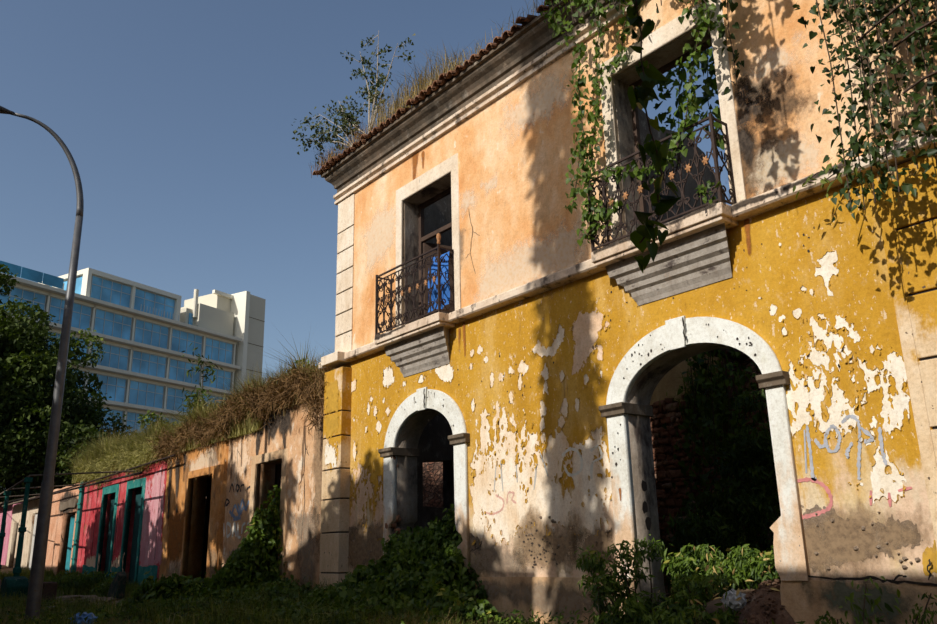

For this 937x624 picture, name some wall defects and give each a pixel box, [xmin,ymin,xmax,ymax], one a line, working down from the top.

water stain [167,453,188,518]
water stain [230,407,292,477]
water stain [293,414,325,585]
peeling [348,441,402,568]
peeling [365,365,406,434]
peeling [435,307,621,568]
water stain [467,508,615,620]
peeling [768,303,937,576]